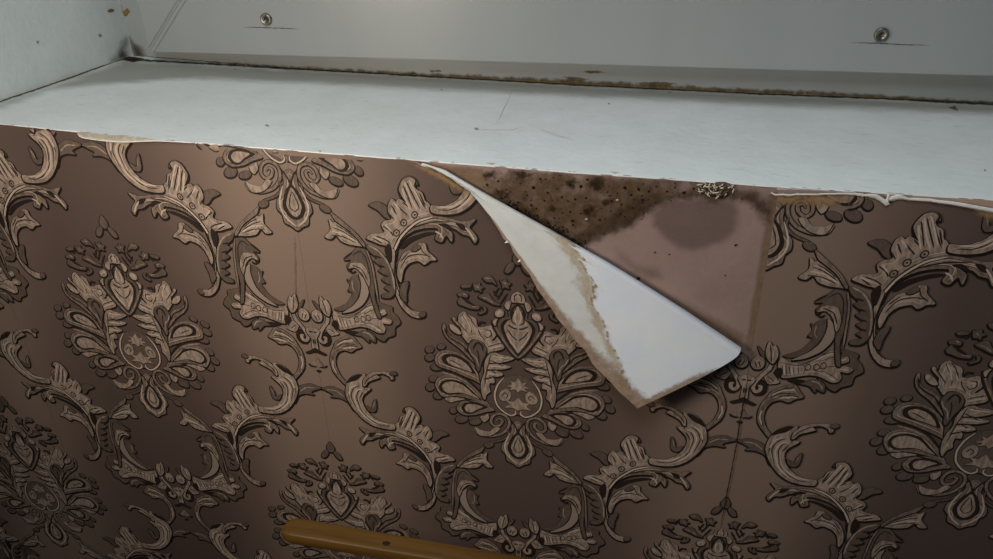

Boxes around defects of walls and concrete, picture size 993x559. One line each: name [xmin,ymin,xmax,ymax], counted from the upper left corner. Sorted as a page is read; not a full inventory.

flaking render [698,182,734,199]
water stain [422,166,713,408]
water stain [665,193,778,350]